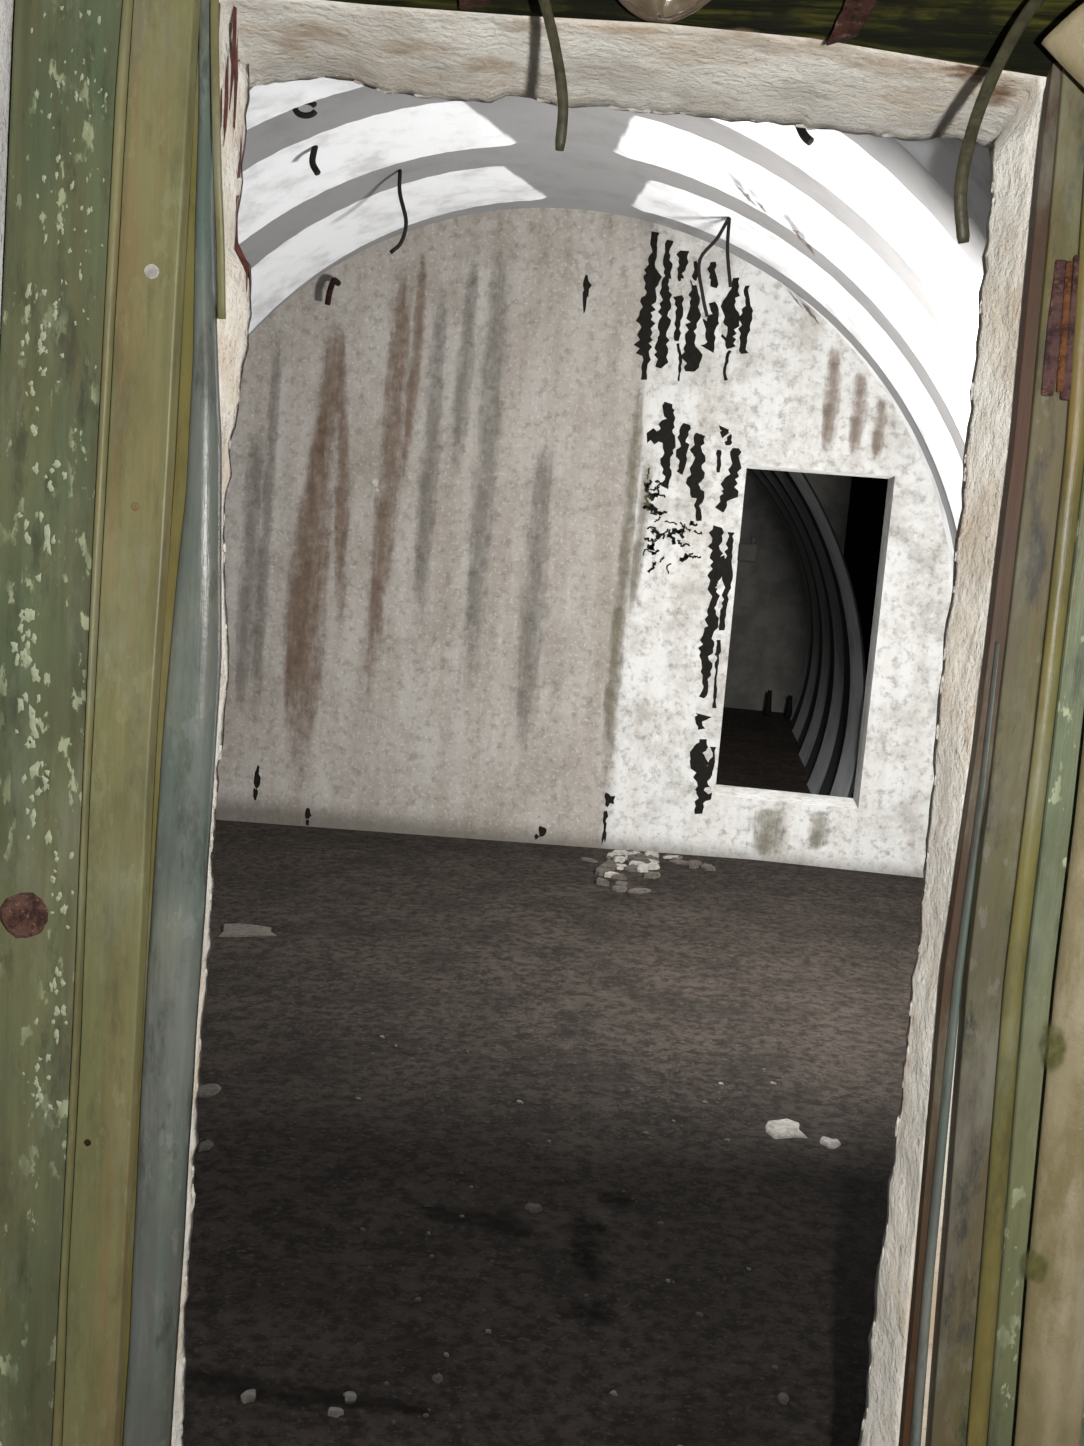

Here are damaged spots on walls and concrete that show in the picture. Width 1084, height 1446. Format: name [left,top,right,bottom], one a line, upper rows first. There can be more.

peeling [20,49,108,436]
peeling [634,231,753,381]
peeling [16,511,56,556]
peeling [32,460,67,492]
peeling [647,402,741,814]
peeling [10,608,74,929]
peeling [23,967,68,1118]